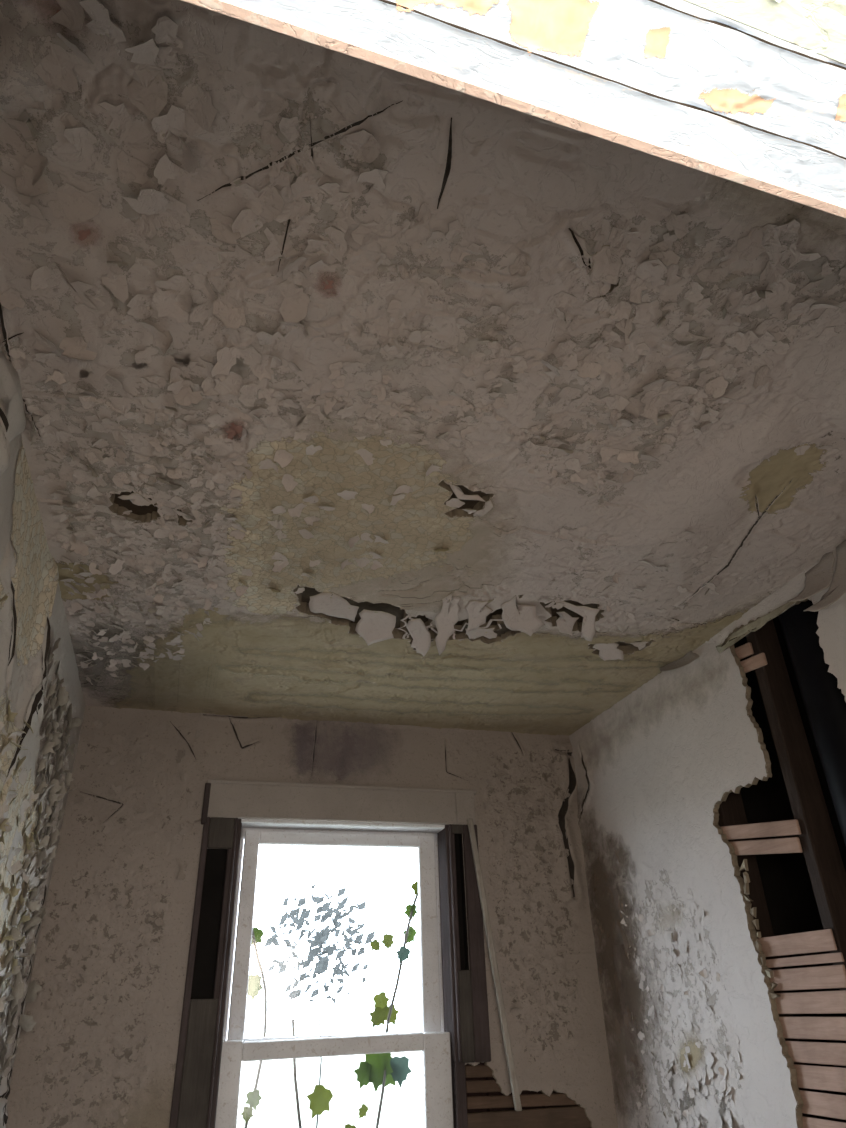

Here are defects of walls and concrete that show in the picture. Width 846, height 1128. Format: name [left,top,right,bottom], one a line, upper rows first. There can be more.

crack [377,0,846,160]
crack [0,303,24,366]
crack [0,397,40,440]
peeling [514,210,846,517]
peeling [0,0,477,1086]
damp [73,603,759,736]
crack [555,749,591,897]
spalling [711,540,846,1128]
spalling [465,1062,596,1128]
damp [577,801,645,1109]
peeling [620,869,744,1128]
damp [679,1041,701,1074]